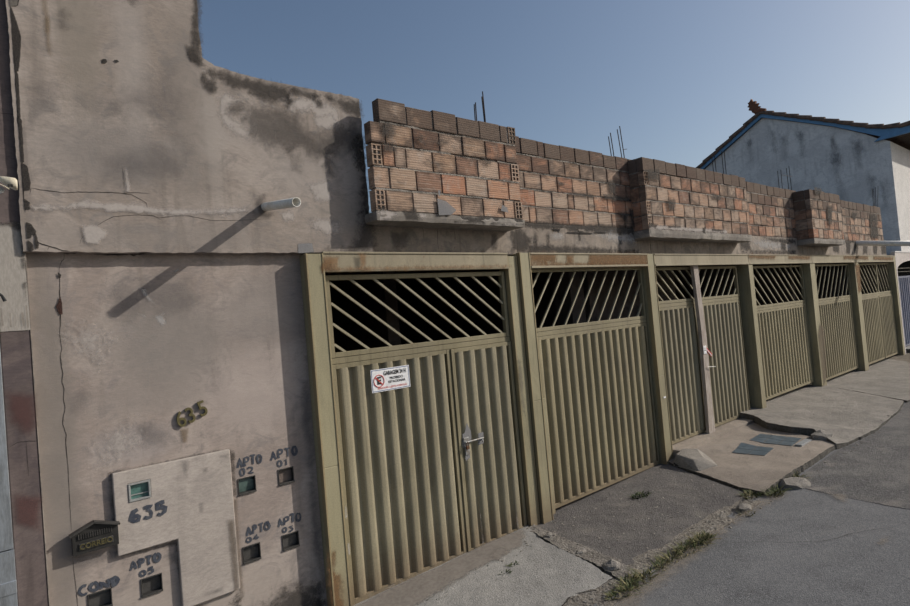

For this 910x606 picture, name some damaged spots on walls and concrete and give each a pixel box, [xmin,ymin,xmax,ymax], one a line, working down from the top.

peeling [10,0,249,215]
leakage [186,0,363,116]
peeling [0,222,39,332]
peeling [83,225,106,244]
leakage [251,111,426,252]
corrosion [531,254,647,266]
crack [21,162,256,530]
leakage [270,584,322,606]